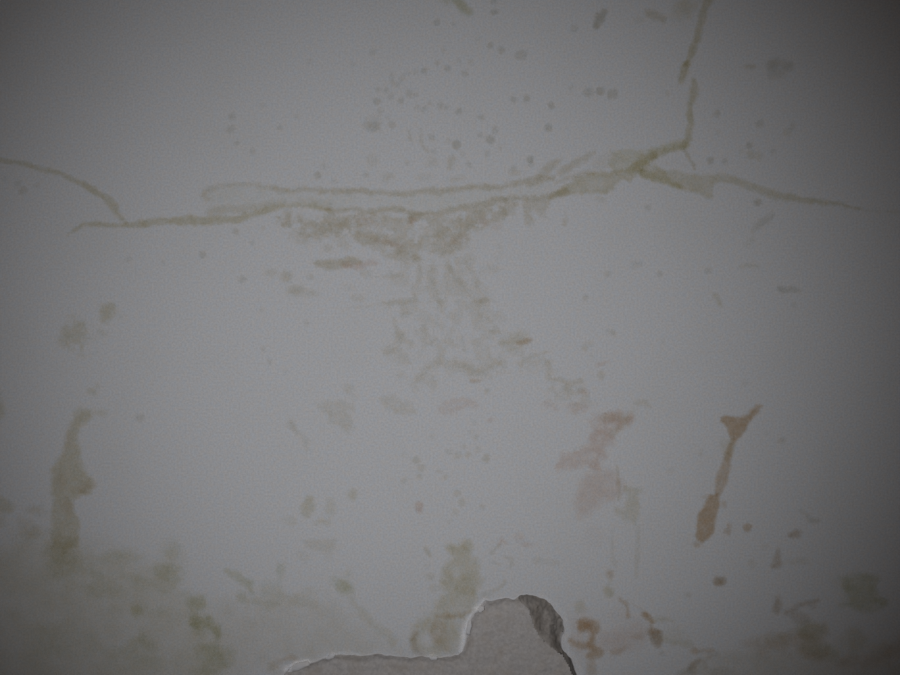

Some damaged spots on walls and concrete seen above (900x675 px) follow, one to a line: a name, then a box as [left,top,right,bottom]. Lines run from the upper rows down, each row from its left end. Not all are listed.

flaking render [283,593,578,675]